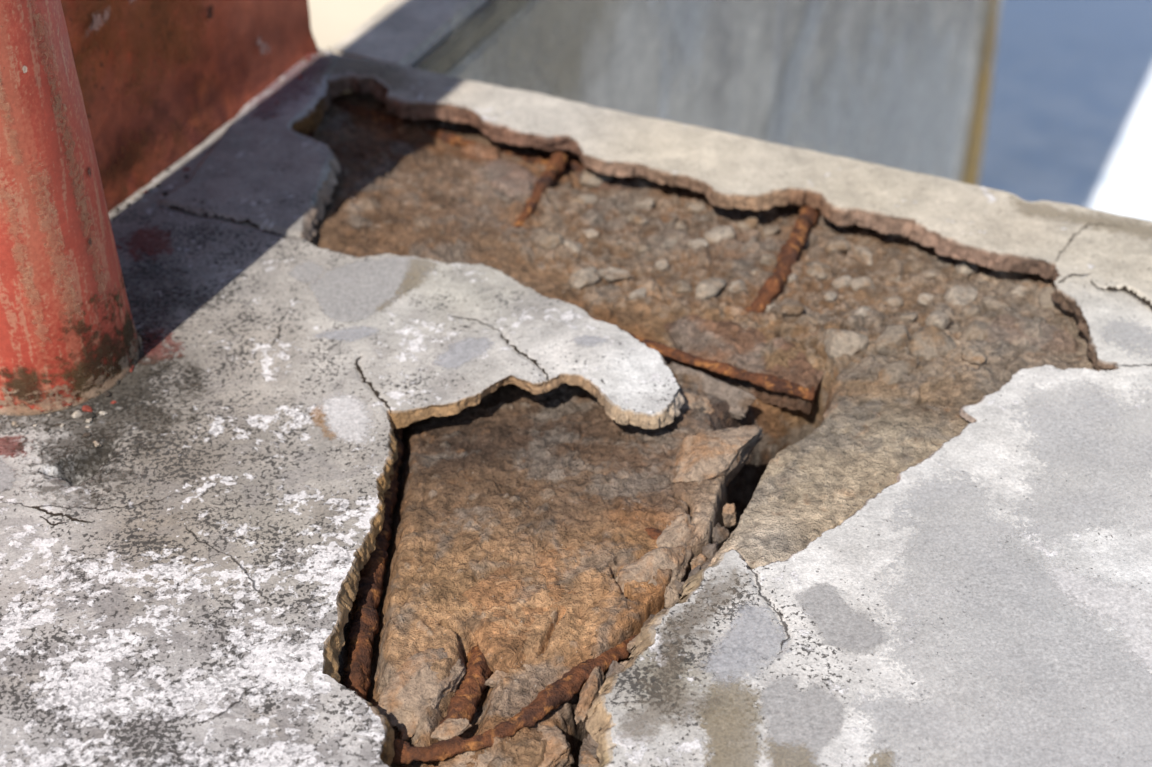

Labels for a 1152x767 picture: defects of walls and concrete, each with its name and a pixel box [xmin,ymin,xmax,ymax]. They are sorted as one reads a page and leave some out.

corrosion [330,97,478,148]
crack [156,205,296,238]
corrosion [745,205,821,313]
crack [1056,223,1152,309]
crack [355,357,391,412]
crack [450,315,549,382]
spalling [309,91,1095,767]
corrosion [619,328,815,401]
corrosion [343,427,404,700]
water stain [884,471,1152,767]
corrosion [392,634,638,764]
water stain [696,583,962,767]